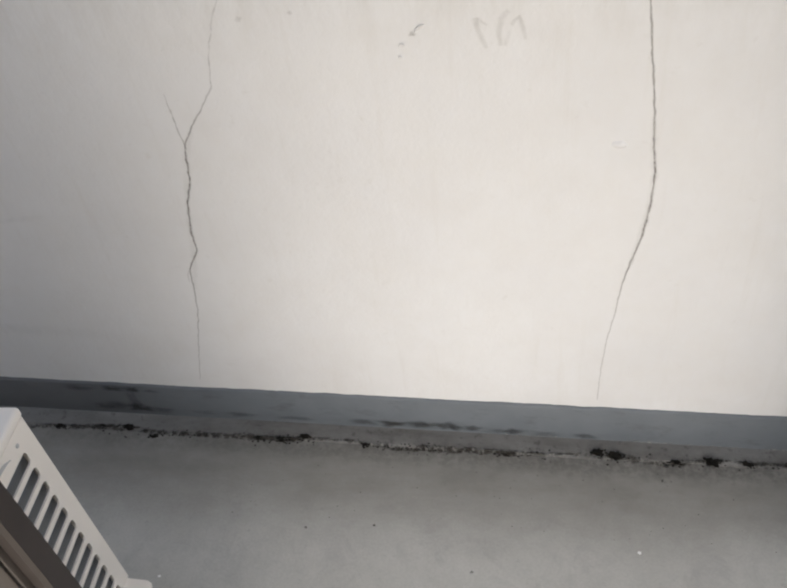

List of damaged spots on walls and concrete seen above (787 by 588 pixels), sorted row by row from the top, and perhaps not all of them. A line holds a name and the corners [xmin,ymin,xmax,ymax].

crack [184,141,197,267]
crack [633,135,656,257]